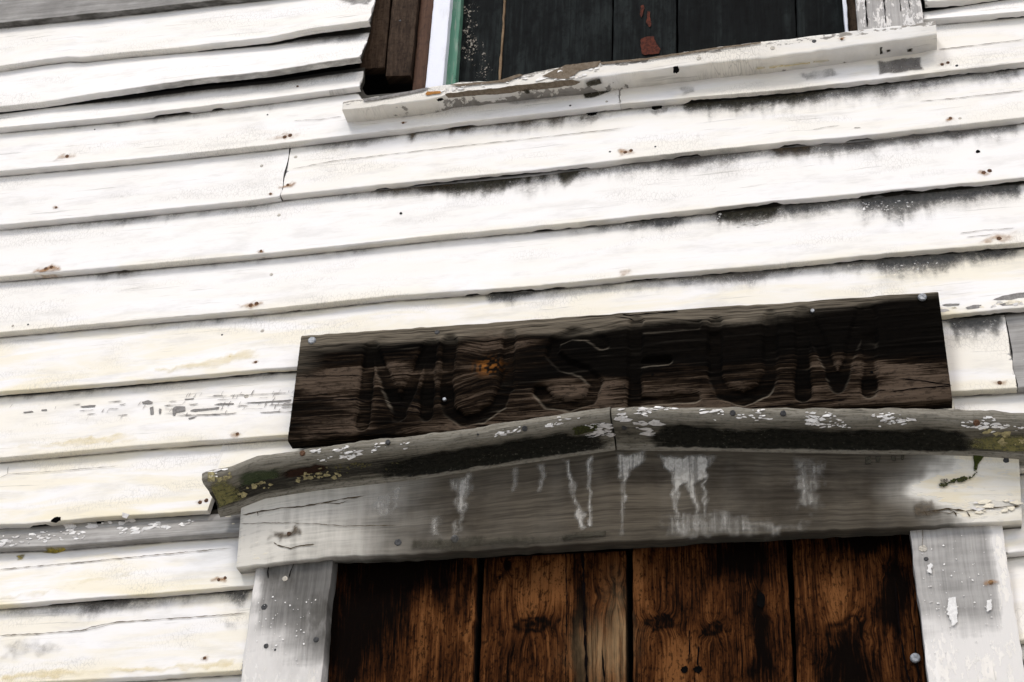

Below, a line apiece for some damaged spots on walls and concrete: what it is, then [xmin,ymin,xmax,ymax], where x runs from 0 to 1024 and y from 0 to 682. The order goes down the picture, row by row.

peeling [363,4,761,101]
leakage [683,91,825,111]
leakage [905,128,978,138]
leakage [773,146,811,154]
leakage [377,170,580,193]
leakage [716,202,832,222]
leakage [862,184,1020,215]
leakage [873,249,1015,270]
peeling [961,416,1024,446]
leakage [384,424,602,511]
peeling [0,512,194,547]
peeling [924,592,998,628]